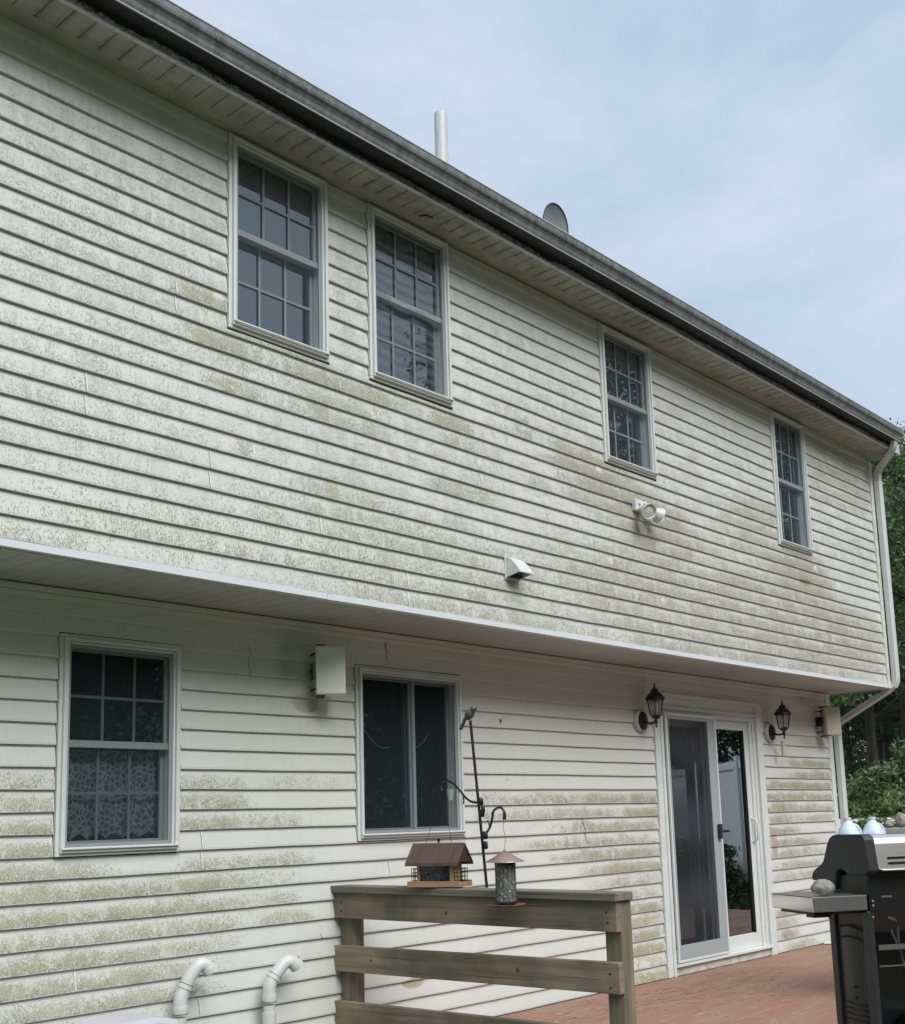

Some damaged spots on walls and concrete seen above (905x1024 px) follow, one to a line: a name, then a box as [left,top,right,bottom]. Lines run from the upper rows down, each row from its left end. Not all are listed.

mould [0,0,890,683]